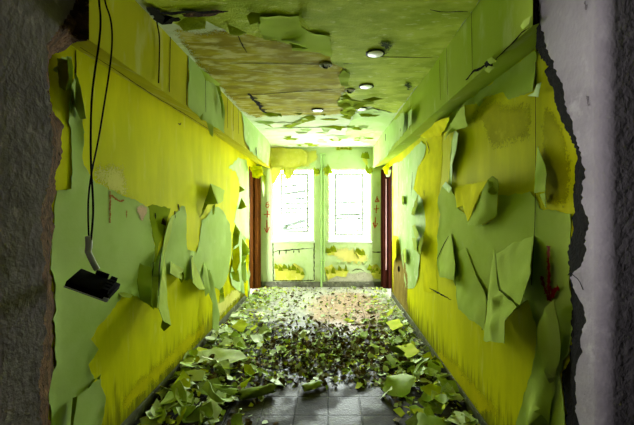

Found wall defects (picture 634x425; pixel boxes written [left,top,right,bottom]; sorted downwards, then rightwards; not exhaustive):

peeling [38,0,479,425]
crack [227,88,344,131]
peeling [383,3,589,425]
crack [466,27,530,80]